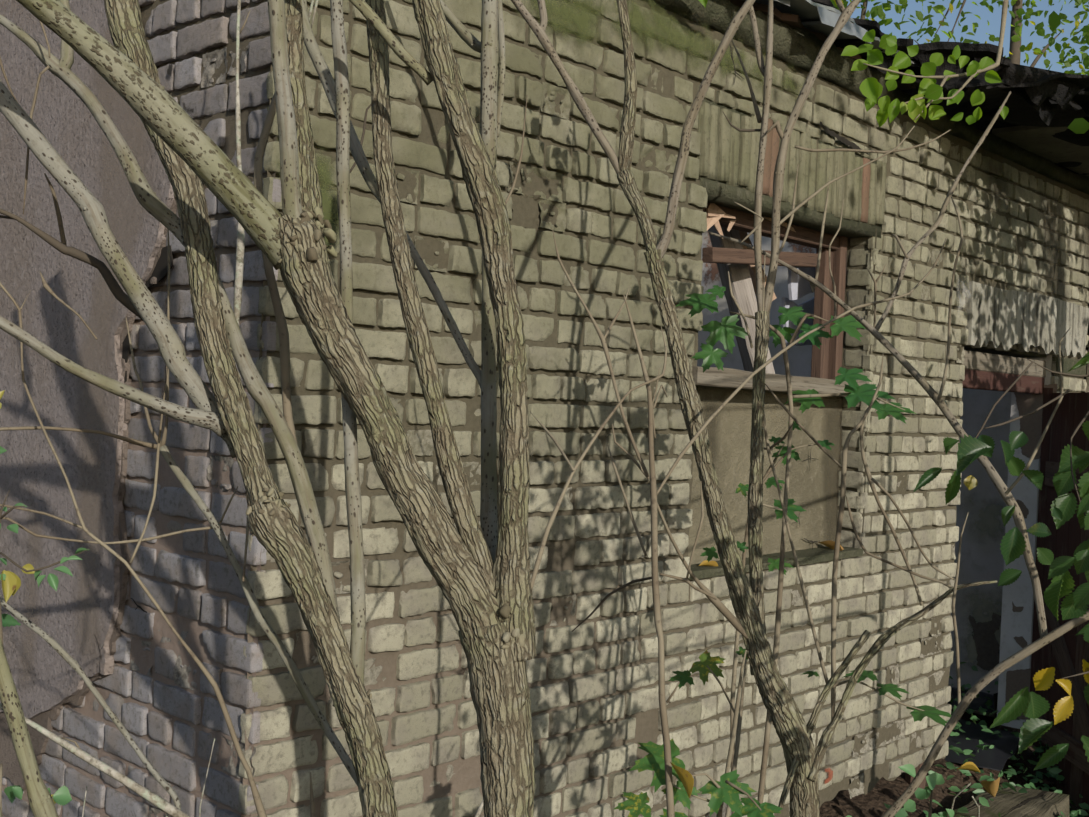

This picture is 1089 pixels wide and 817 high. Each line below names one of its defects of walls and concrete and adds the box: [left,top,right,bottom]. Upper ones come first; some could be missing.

peeling [1014,384,1058,459]
peeling [1016,500,1029,518]
spalling [174,653,201,693]
flaking render [968,613,1031,704]
flaking render [0,712,26,791]
flaking render [27,705,63,766]
spalling [221,736,256,779]